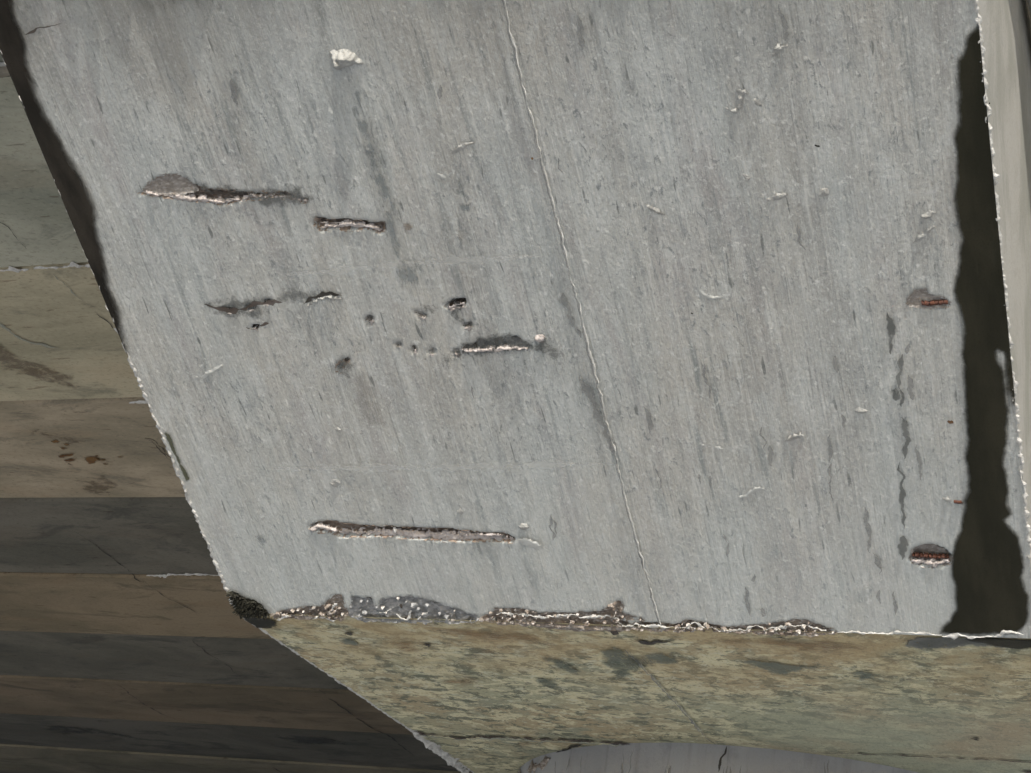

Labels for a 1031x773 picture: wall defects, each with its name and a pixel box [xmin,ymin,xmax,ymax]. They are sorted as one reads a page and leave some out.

spalling [136,173,312,206]
spalling [313,217,386,234]
spalling [396,298,558,362]
leakage [838,25,1031,649]
spalling [310,520,541,549]
spalling [270,594,838,638]
leakage [744,574,766,617]